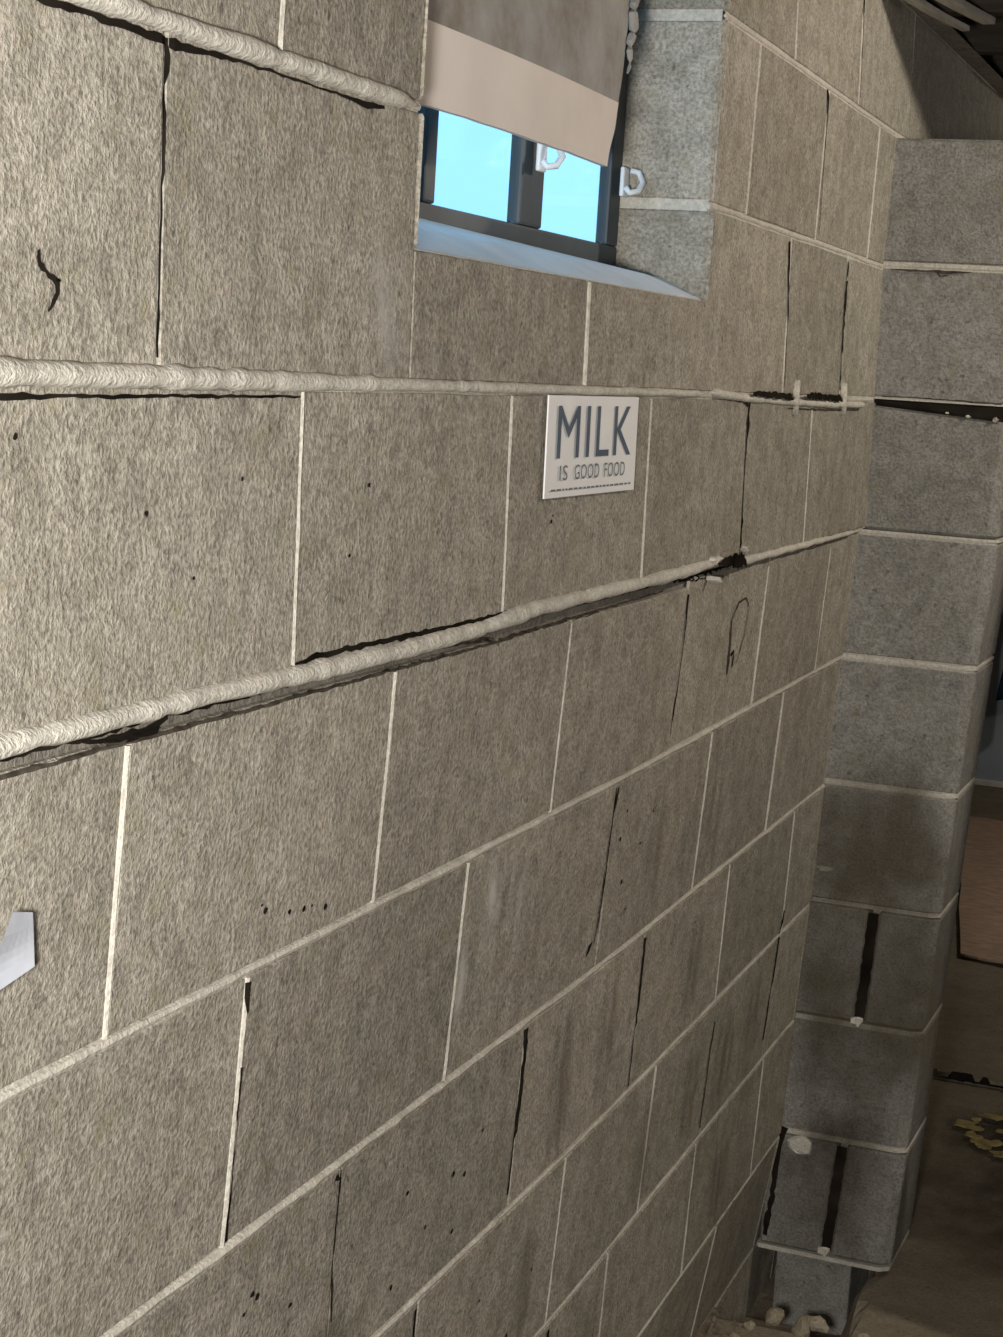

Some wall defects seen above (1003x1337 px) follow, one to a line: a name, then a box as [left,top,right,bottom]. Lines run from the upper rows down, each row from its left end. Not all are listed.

crack [0,0,1003,781]
crack [933,1068,1003,1089]